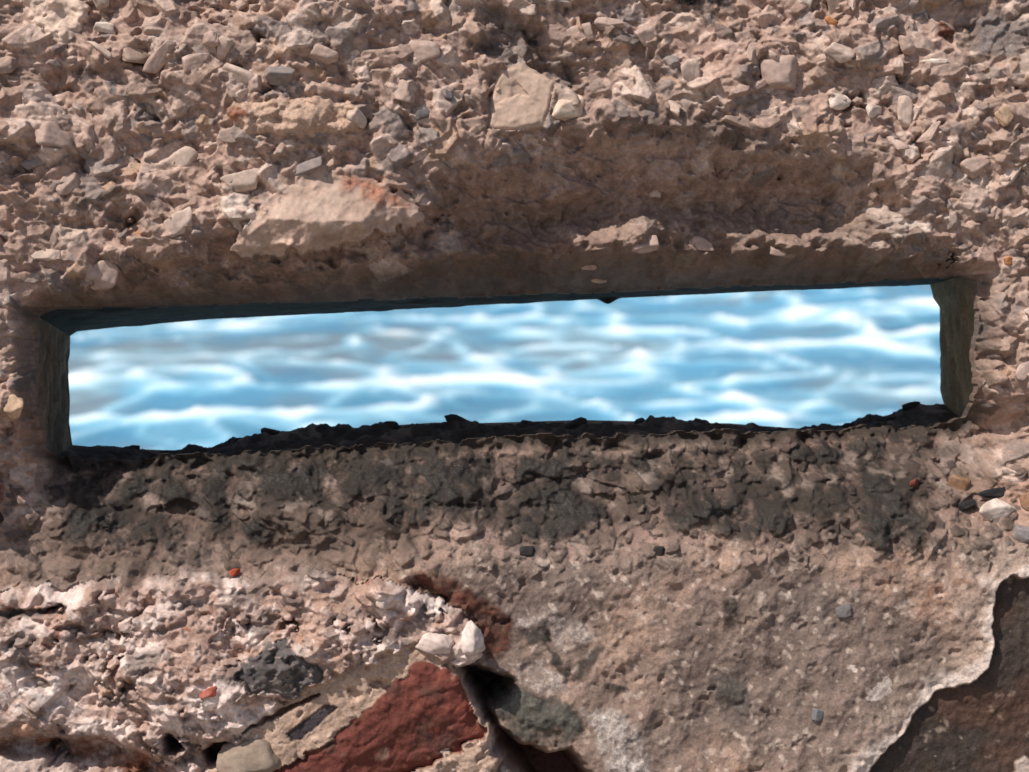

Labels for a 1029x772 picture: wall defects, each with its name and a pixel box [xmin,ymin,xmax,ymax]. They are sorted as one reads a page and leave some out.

crack [447,662,594,772]
peeling [849,564,1029,772]